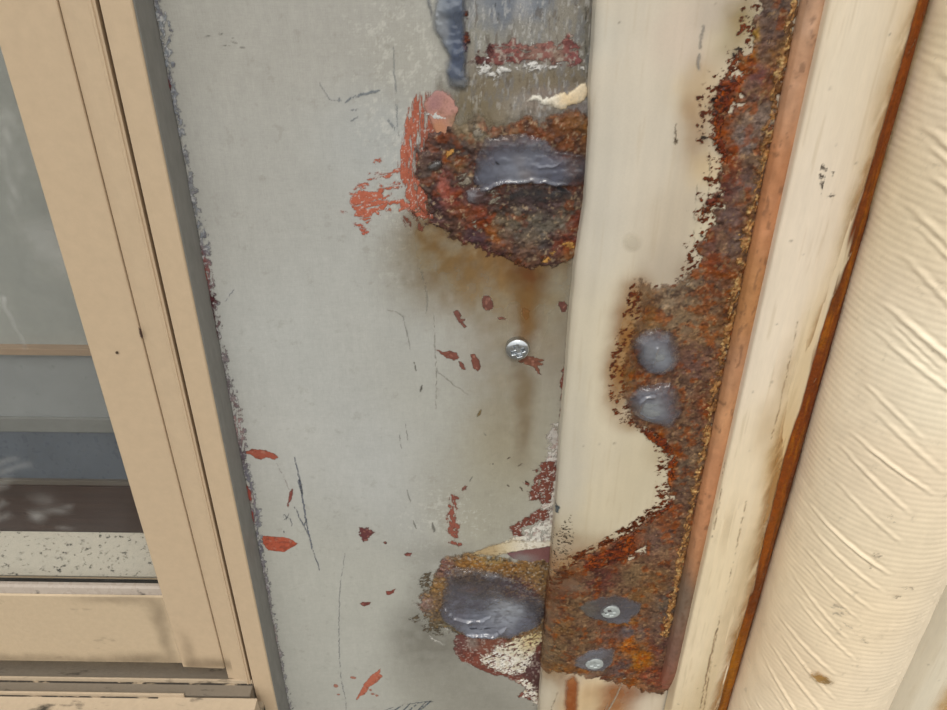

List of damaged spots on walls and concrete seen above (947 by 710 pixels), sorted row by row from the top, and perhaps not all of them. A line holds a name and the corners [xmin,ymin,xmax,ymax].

peeling [471,33,585,80]
peeling [482,296,506,320]
peeling [154,0,297,710]
peeling [437,350,481,371]
peeling [518,356,544,375]
corrosion [407,0,799,710]
peeling [473,368,564,563]
peeling [351,669,382,700]